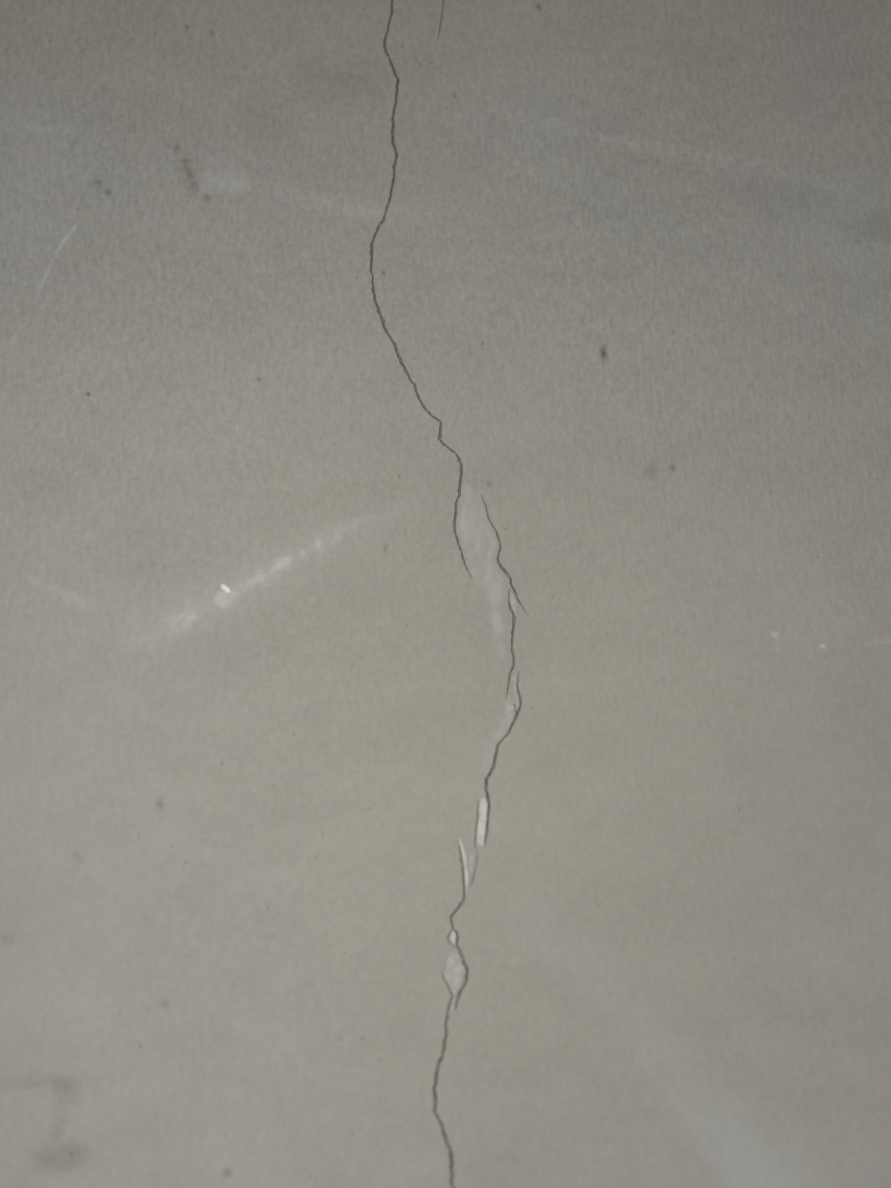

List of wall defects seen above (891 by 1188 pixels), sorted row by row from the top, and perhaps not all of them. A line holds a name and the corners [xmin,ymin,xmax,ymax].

crack [370,0,529,1188]